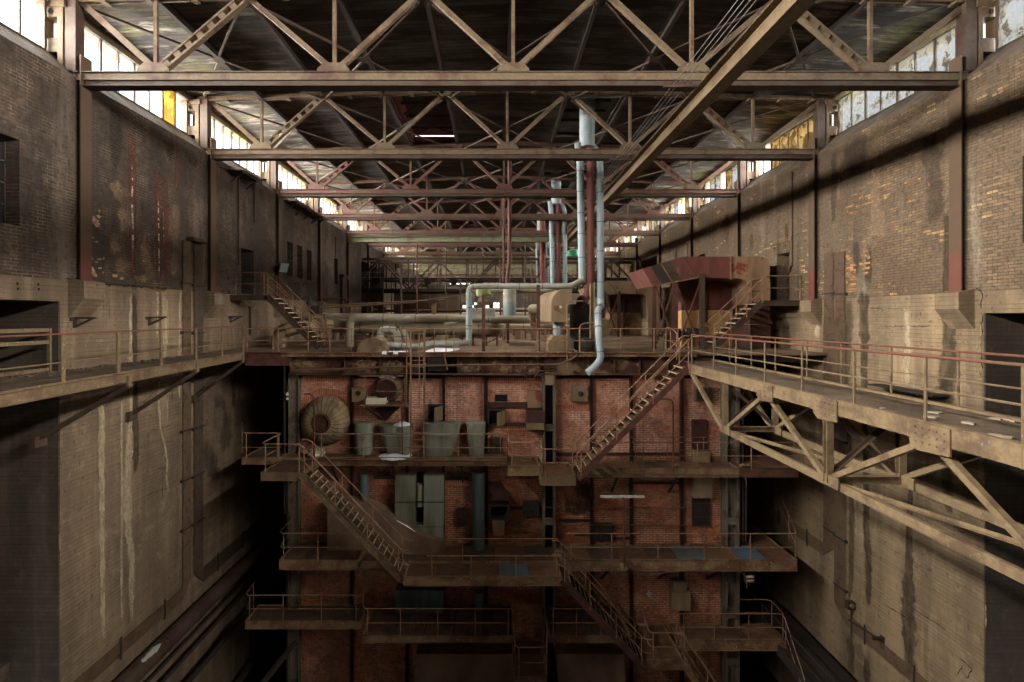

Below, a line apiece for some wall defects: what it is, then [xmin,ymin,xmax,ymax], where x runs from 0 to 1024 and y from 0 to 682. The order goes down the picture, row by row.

flaking render [92,181,152,282]
water stain [921,139,949,292]
water stain [129,296,137,362]
water stain [845,293,870,388]
water stain [940,321,957,404]
water stain [120,381,139,618]
water stain [847,423,870,491]
water stain [942,469,952,512]
water stain [849,499,872,604]
water stain [901,489,917,679]